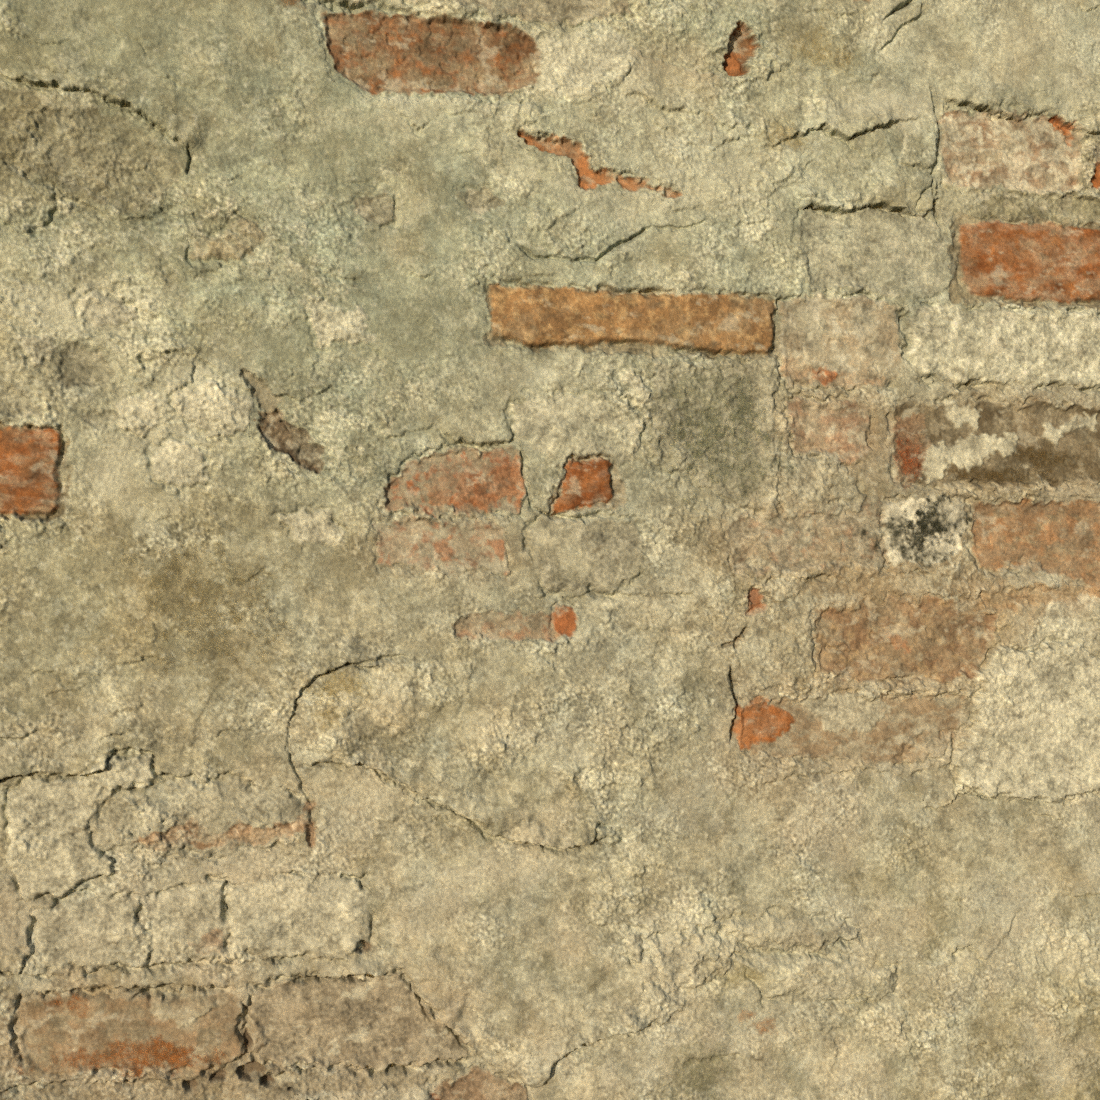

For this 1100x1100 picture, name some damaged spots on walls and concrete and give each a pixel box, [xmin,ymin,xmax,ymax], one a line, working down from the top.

spalling [301,0,634,106]
spalling [718,18,768,82]
crack [879,0,928,53]
spalling [513,124,688,203]
spalling [935,83,1100,202]
spalling [483,211,1100,595]
spalling [0,422,74,525]
spalling [373,440,530,579]
crack [285,653,412,803]
peeling [736,587,1100,785]
spalling [0,728,688,1100]